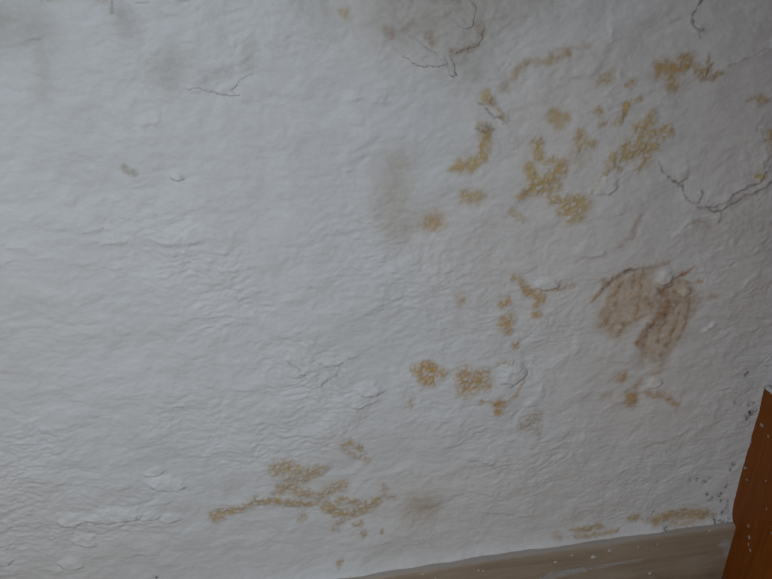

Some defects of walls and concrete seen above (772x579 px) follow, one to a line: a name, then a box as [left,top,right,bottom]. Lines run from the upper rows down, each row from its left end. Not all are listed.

damp [450,124,491,171]
damp [520,140,587,222]
damp [210,462,380,523]